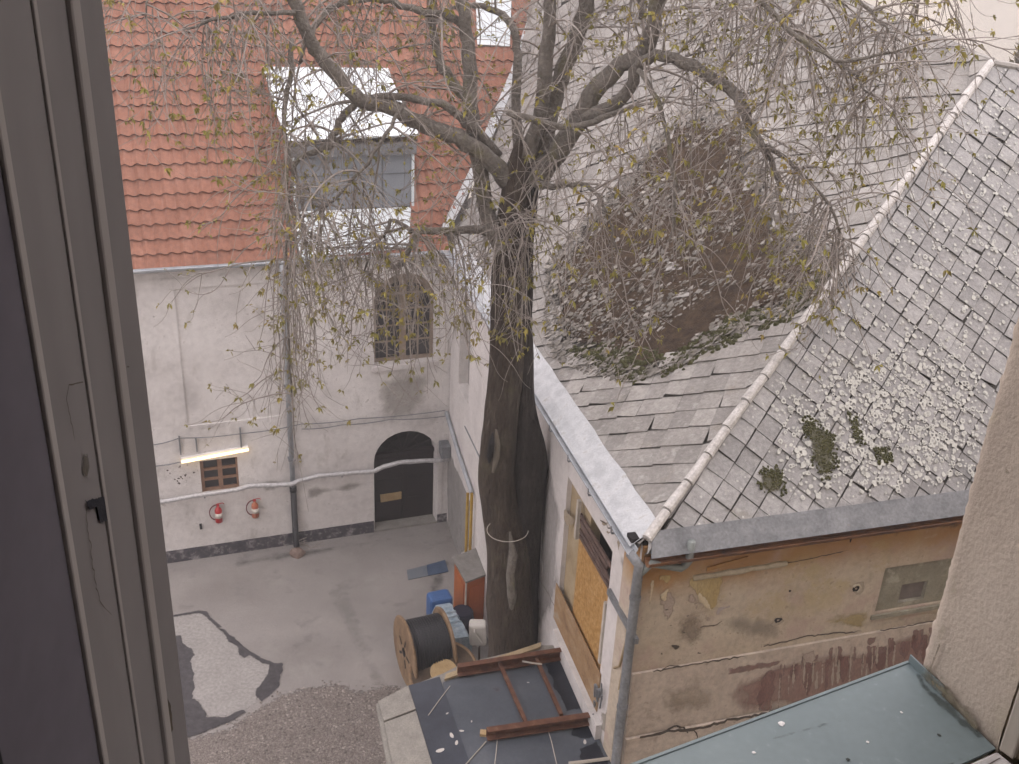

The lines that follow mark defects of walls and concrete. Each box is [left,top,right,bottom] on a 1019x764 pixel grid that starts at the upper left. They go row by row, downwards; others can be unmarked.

peeling [649,575,730,640]
crack [653,620,934,672]
leakage [729,628,977,730]
crack [640,708,778,738]